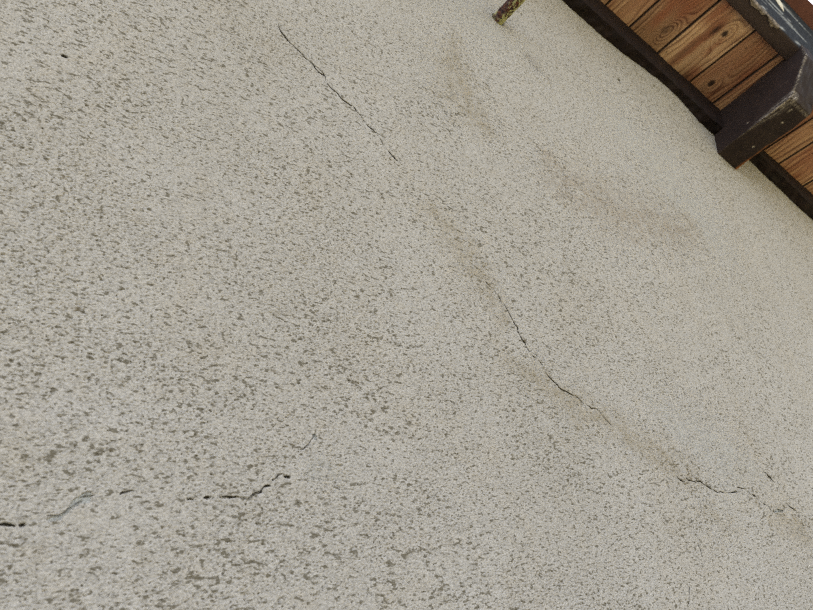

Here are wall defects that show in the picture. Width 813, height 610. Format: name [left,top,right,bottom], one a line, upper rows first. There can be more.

crack [278,26,397,161]
crack [486,282,610,424]
crack [46,492,94,521]
crack [192,474,290,500]
crack [677,477,796,513]